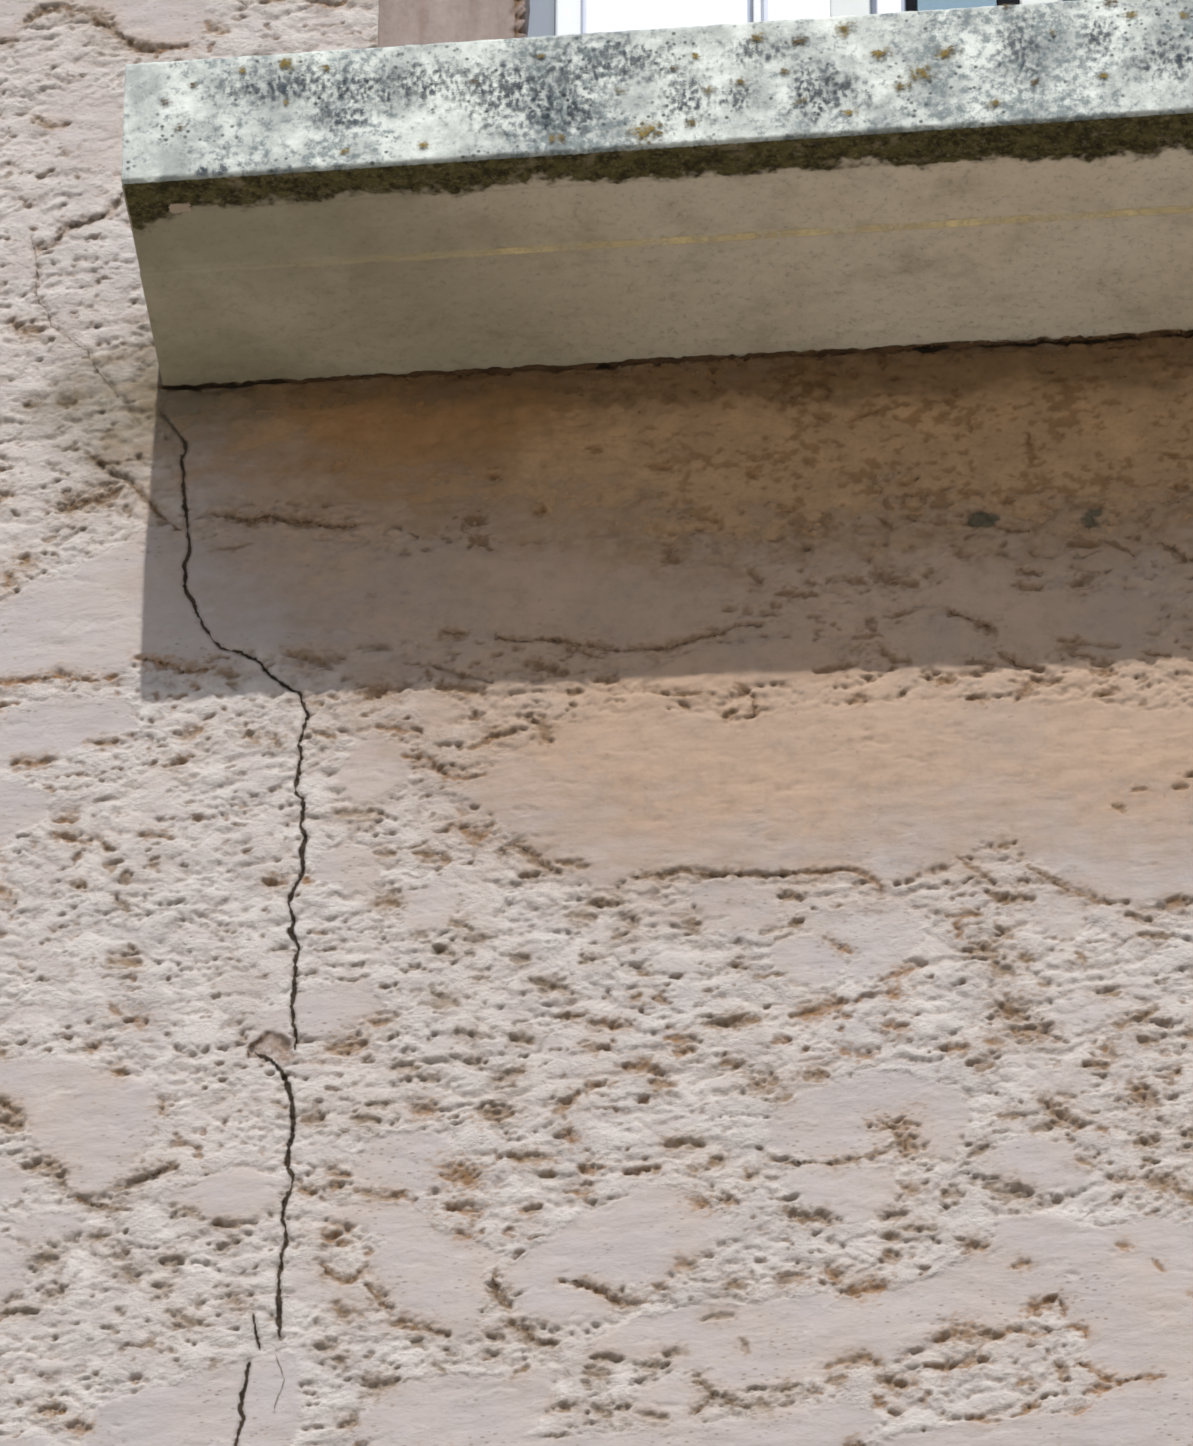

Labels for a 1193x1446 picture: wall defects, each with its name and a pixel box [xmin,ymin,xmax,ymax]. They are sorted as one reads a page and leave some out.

crack [31,192,310,1446]